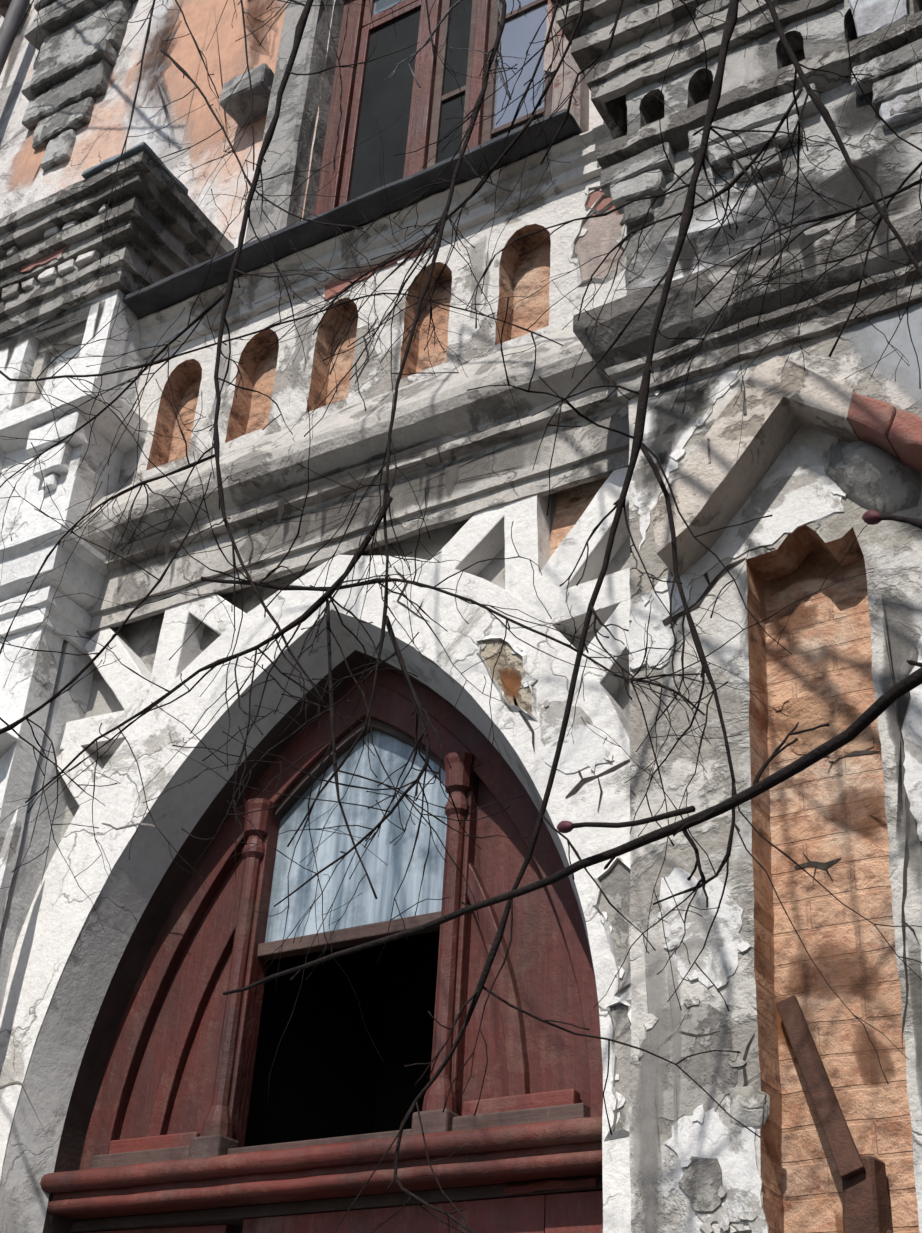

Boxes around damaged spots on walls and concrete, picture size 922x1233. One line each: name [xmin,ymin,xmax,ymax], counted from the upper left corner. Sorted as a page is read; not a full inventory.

peeling [123,0,286,153]
peeling [11,130,47,188]
peeling [630,358,749,552]
flaking render [847,391,922,474]
peeling [625,445,847,671]
peeling [476,635,615,774]
peeling [903,636,922,841]
damp [790,947,872,998]
crack [0,1080,31,1088]
peeling [592,857,757,1233]
damp [856,1027,893,1082]